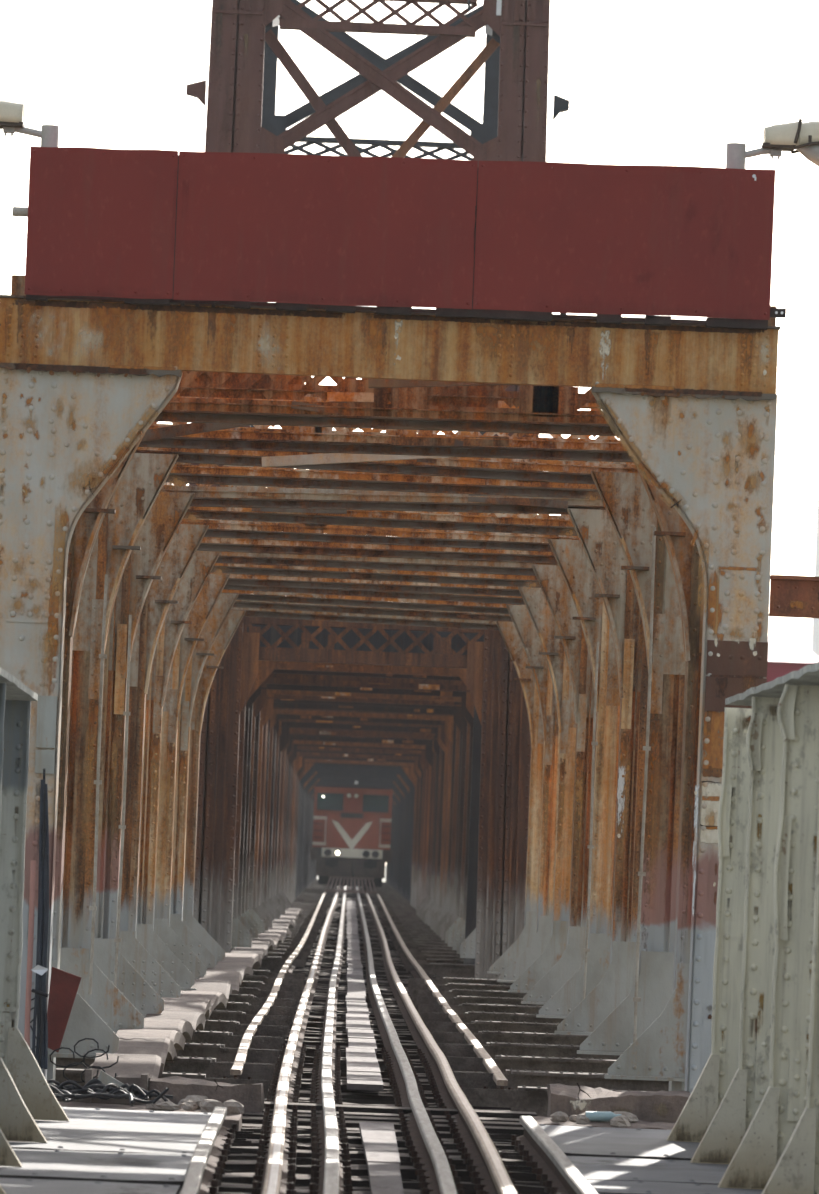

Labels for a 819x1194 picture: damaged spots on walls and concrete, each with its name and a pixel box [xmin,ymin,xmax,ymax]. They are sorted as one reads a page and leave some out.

corrosion [2,363,176,419]
corrosion [5,299,345,357]
corrosion [366,313,764,373]
corrosion [70,407,158,492]
corrosion [136,473,185,514]
corrosion [595,383,769,525]
corrosion [12,512,69,693]
corrosion [691,530,763,641]
corrosion [84,699,99,821]
corrosion [151,734,187,832]
corrosion [543,752,584,854]
corrosion [702,711,725,778]